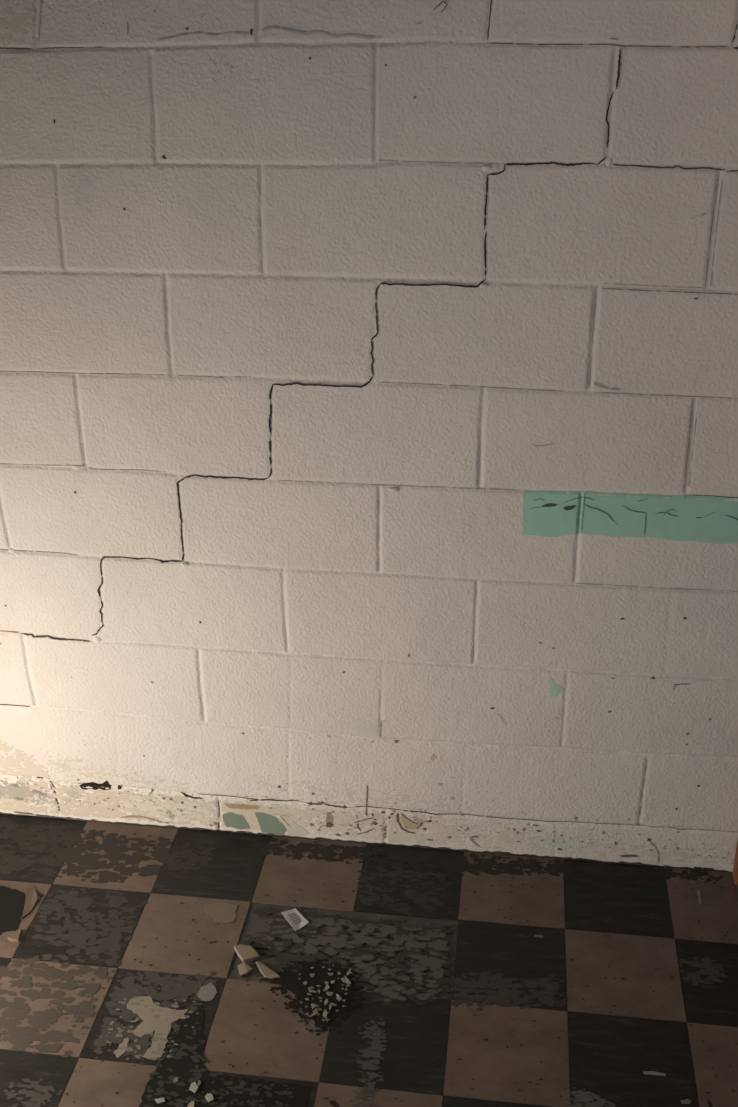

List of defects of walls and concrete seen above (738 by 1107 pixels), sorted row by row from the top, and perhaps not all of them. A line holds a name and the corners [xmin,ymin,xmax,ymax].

crack [0,0,738,642]